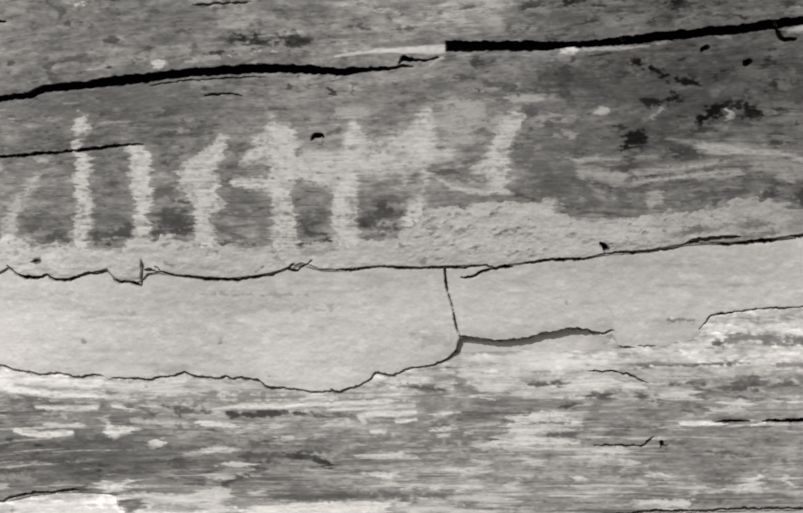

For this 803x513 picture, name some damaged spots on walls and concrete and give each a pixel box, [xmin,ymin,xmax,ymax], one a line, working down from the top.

crack [0,16,803,102]
water stain [491,0,772,169]
crack [0,143,138,158]
water stain [496,127,602,220]
crack [719,237,772,245]
crack [18,260,140,285]
crack [171,267,299,281]
crack [393,257,586,330]
crack [593,370,643,381]
peeling [0,350,803,513]
crack [721,416,745,424]
crack [766,416,803,424]